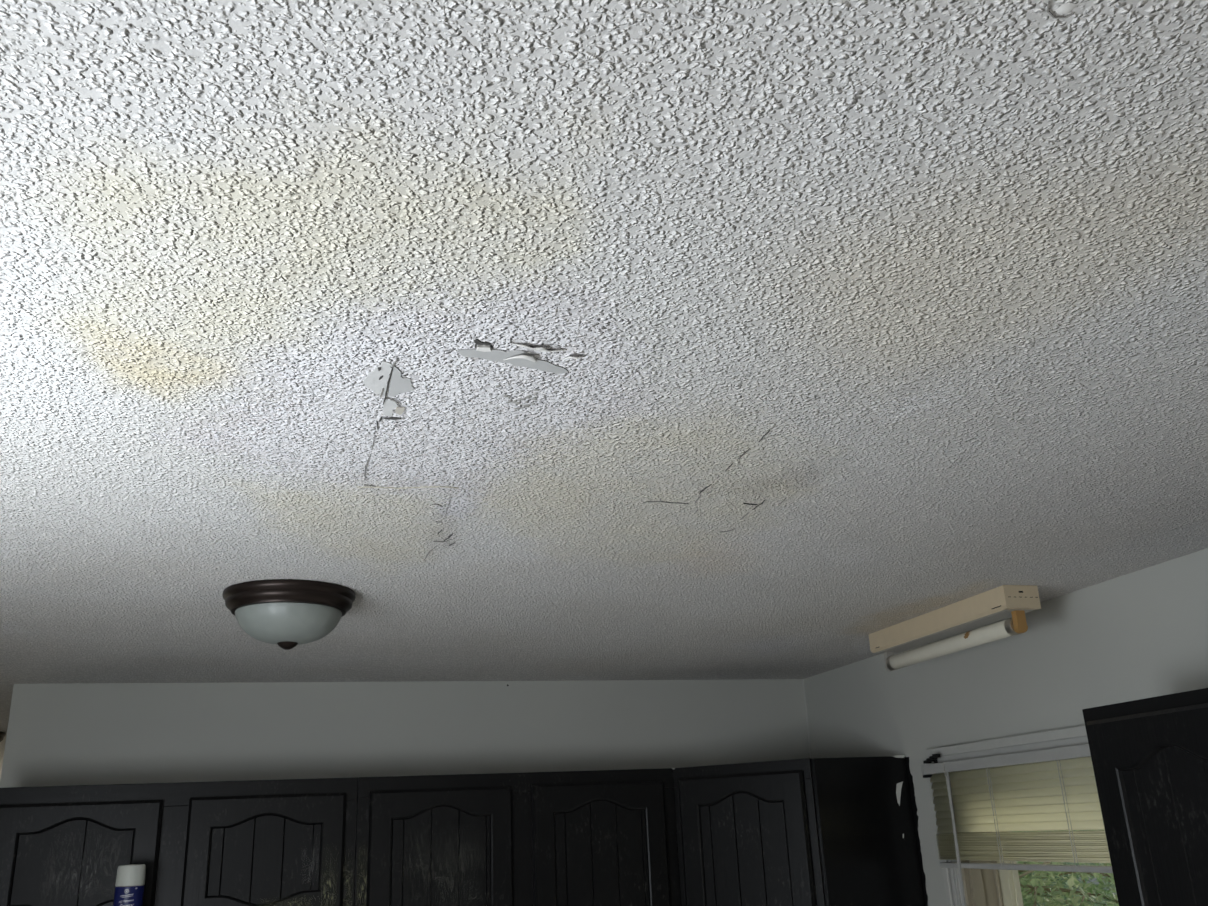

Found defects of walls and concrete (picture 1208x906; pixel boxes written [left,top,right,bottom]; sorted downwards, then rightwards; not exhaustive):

peeling [457,339,586,374]
peeling [363,358,414,416]
spalling [496,385,541,410]
crack [357,417,459,489]
crack [643,430,770,514]
crack [721,498,786,532]